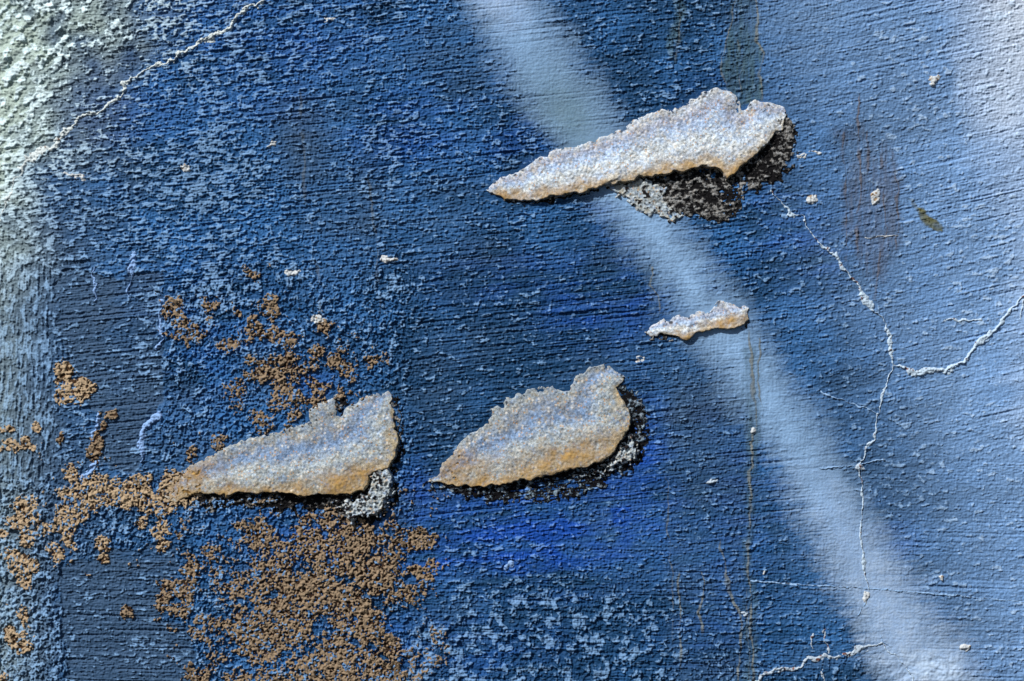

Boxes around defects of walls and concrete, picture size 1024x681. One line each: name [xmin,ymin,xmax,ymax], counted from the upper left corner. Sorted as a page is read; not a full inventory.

crack [0,0,264,222]
spalling [487,88,799,229]
peeling [242,263,270,283]
peeling [0,290,655,681]
crack [750,190,1024,616]
crack [755,629,914,681]